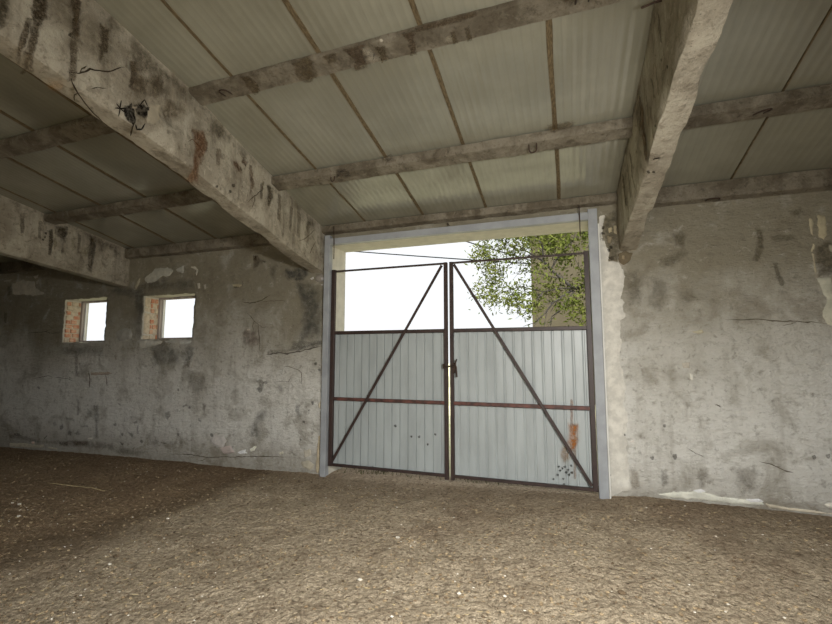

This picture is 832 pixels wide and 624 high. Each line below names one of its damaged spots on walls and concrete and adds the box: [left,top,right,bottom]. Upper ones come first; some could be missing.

leakage [16,0,47,74]
leakage [68,0,81,81]
flaking render [602,217,633,265]
flaking render [4,275,44,296]
flaking render [135,266,206,289]